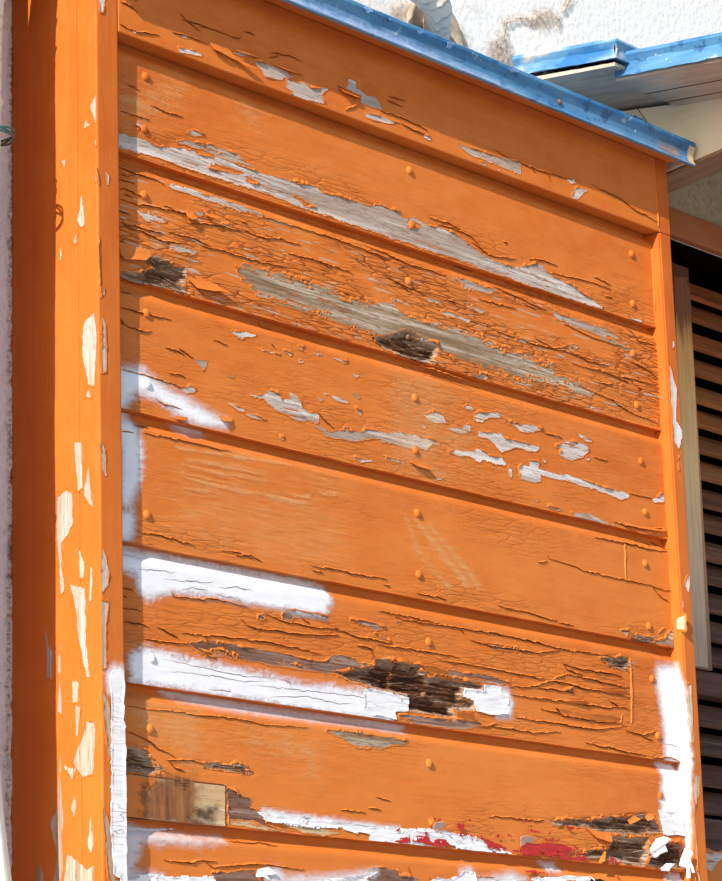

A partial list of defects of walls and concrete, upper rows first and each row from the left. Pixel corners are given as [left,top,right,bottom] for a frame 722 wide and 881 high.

crack [495,0,571,65]